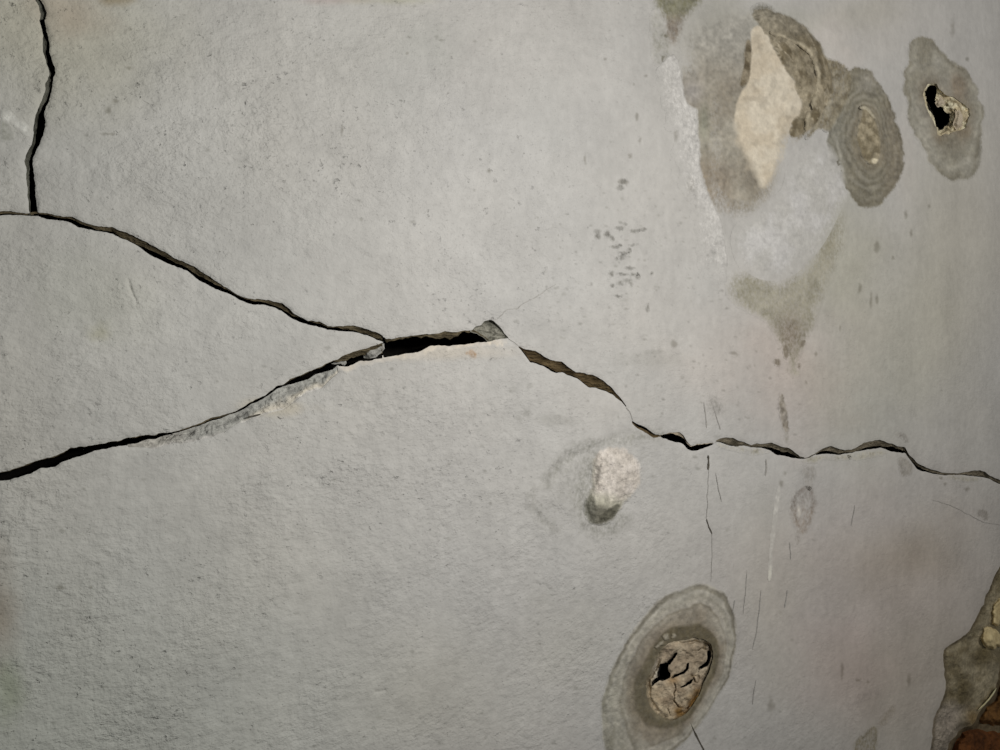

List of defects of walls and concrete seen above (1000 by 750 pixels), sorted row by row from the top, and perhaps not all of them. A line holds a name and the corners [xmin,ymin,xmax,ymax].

crack [0,0,1000,578]
water stain [649,0,704,67]
peeling [654,2,853,284]
water stain [725,35,986,379]
spalling [930,567,1000,750]